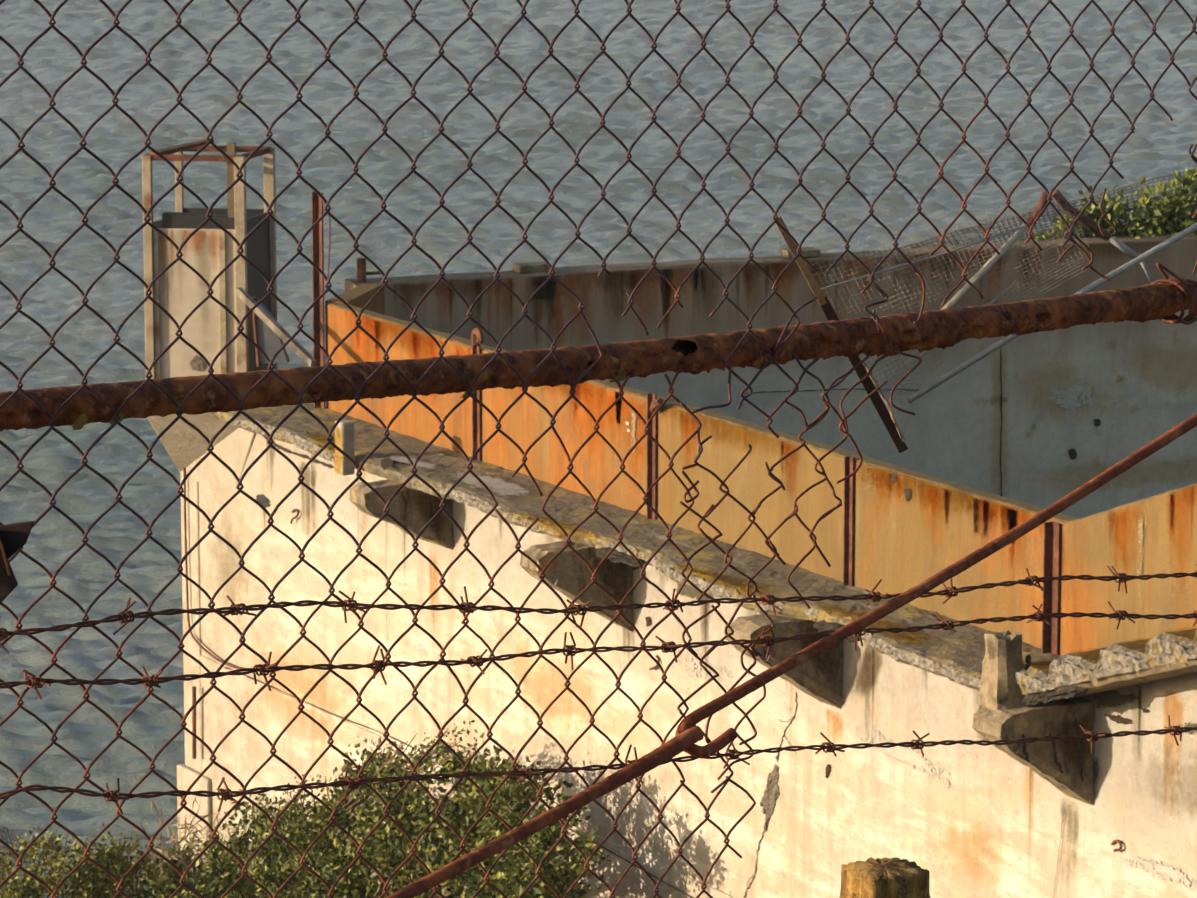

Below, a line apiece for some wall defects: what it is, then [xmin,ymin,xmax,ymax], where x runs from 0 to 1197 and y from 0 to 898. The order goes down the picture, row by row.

crack [777,693,797,761]
spalling [1021,686,1088,706]